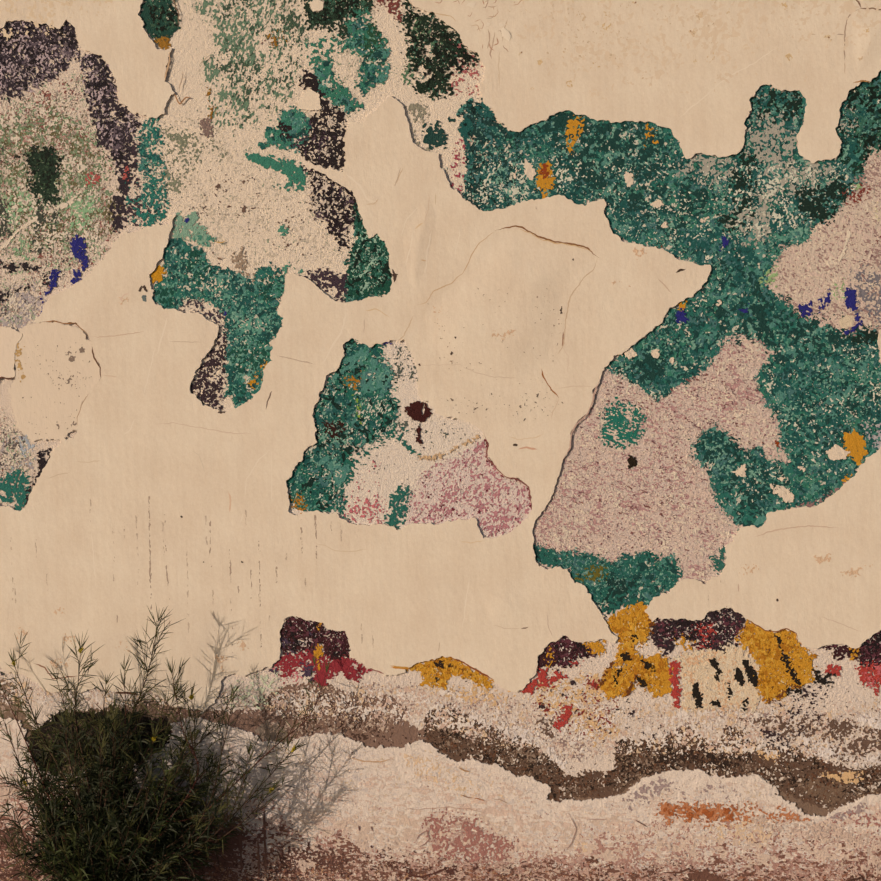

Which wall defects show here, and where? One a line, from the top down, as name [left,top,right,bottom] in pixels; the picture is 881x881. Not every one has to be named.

peeling [0,0,881,620]
crack [521,229,596,354]
crack [542,371,559,415]
peeling [0,680,28,727]
peeling [170,682,881,810]
spalling [687,868,727,881]